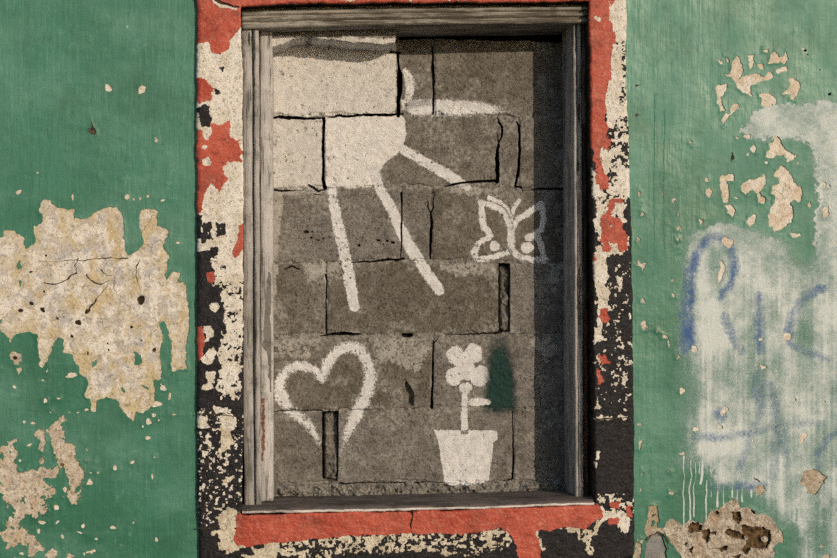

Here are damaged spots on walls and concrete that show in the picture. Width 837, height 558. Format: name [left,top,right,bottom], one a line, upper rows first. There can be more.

crack [212,0,237,10]
peeling [716,49,800,126]
peeling [591,0,647,421]
peeling [705,137,811,237]
peeling [196,27,512,558]
peeling [0,194,190,558]
peeling [560,488,642,556]
spalling [633,499,784,558]